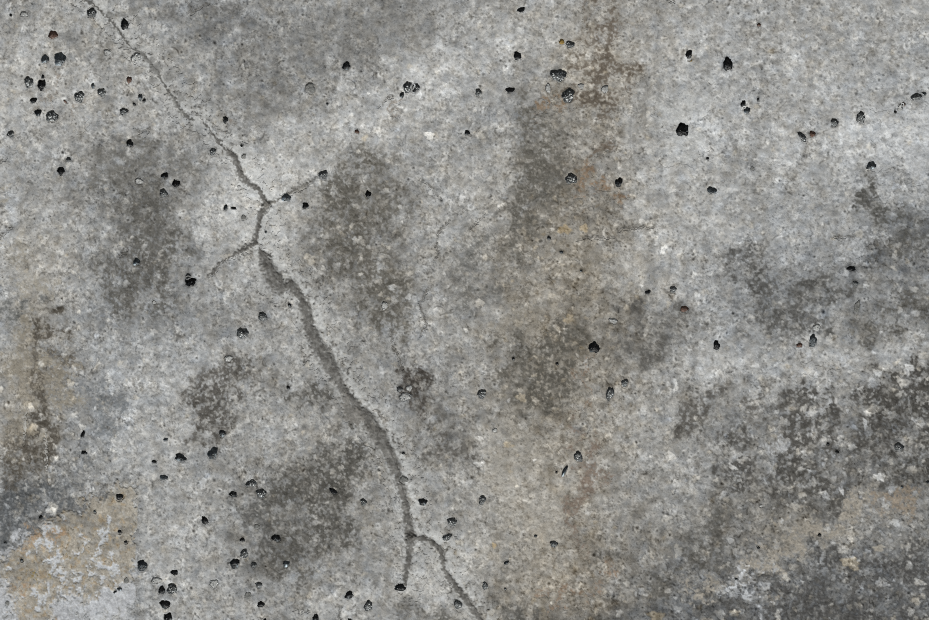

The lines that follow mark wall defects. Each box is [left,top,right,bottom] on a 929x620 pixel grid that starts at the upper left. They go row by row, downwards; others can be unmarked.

leakage [79,130,209,331]
crack [70,0,502,620]
leakage [303,141,418,348]
leakage [720,100,929,345]
leakage [589,282,929,620]